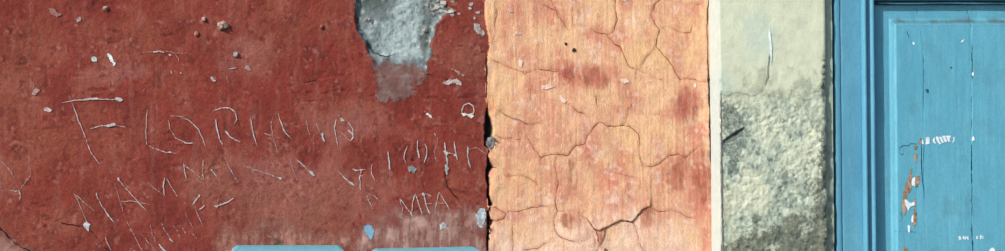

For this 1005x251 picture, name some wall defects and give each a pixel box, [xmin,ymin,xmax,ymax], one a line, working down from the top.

spalling [354,0,485,103]
crack [444,0,770,251]
water stain [721,64,827,251]
peeling [899,136,955,233]
peeling [0,232,33,251]